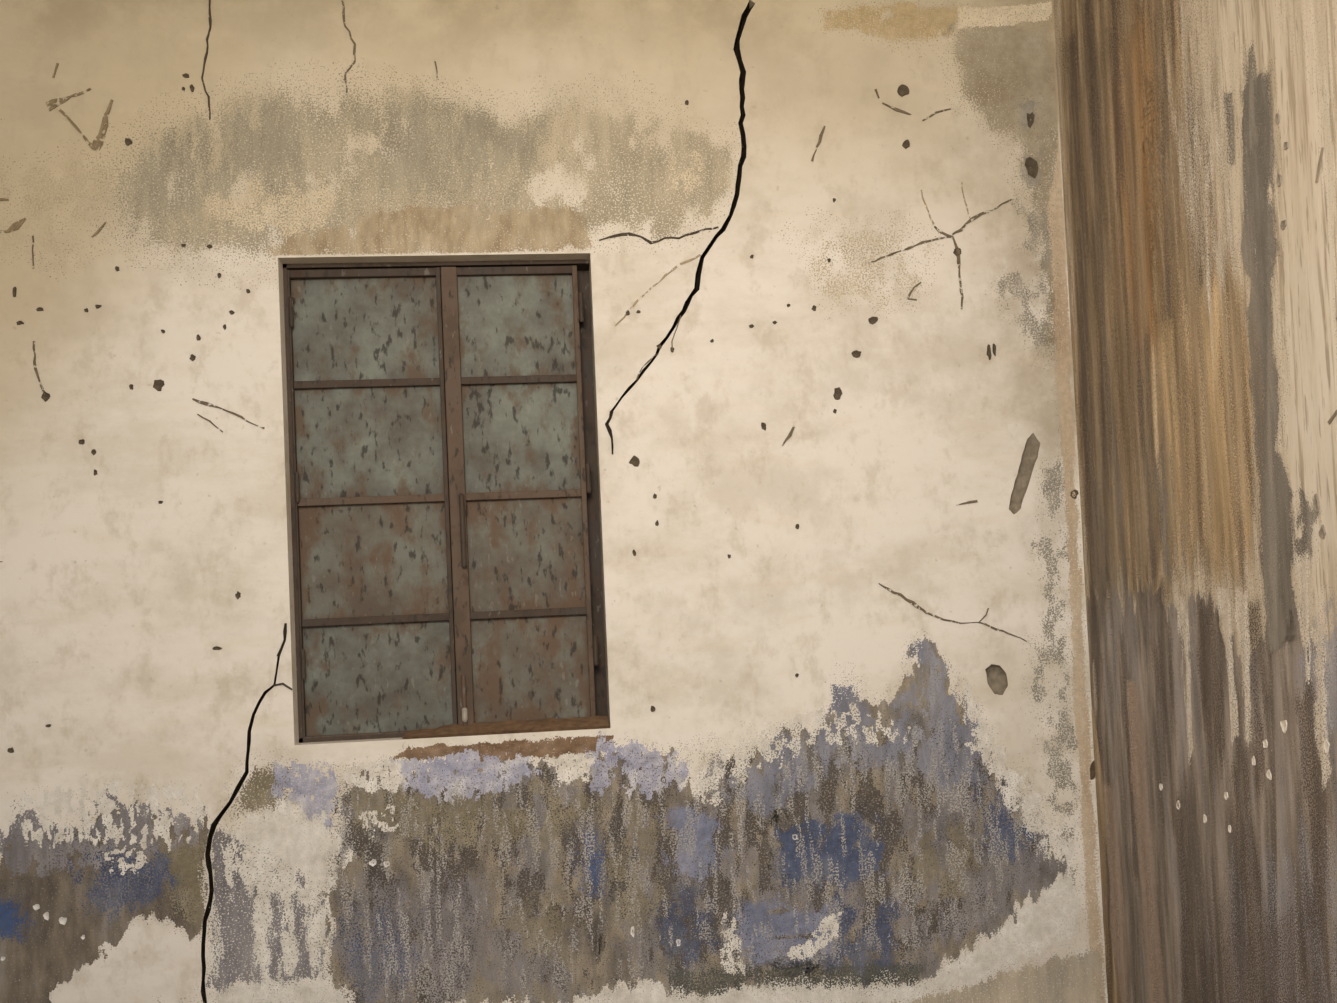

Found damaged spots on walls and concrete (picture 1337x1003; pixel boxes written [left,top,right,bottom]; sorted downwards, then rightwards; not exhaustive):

water stain [0,75,735,271]
crack [599,0,755,454]
crack [862,184,1012,309]
peeling [0,136,1106,1003]
water stain [568,0,1337,1003]
crack [879,583,1027,642]
crack [201,623,292,1003]
water stain [211,973,348,1003]